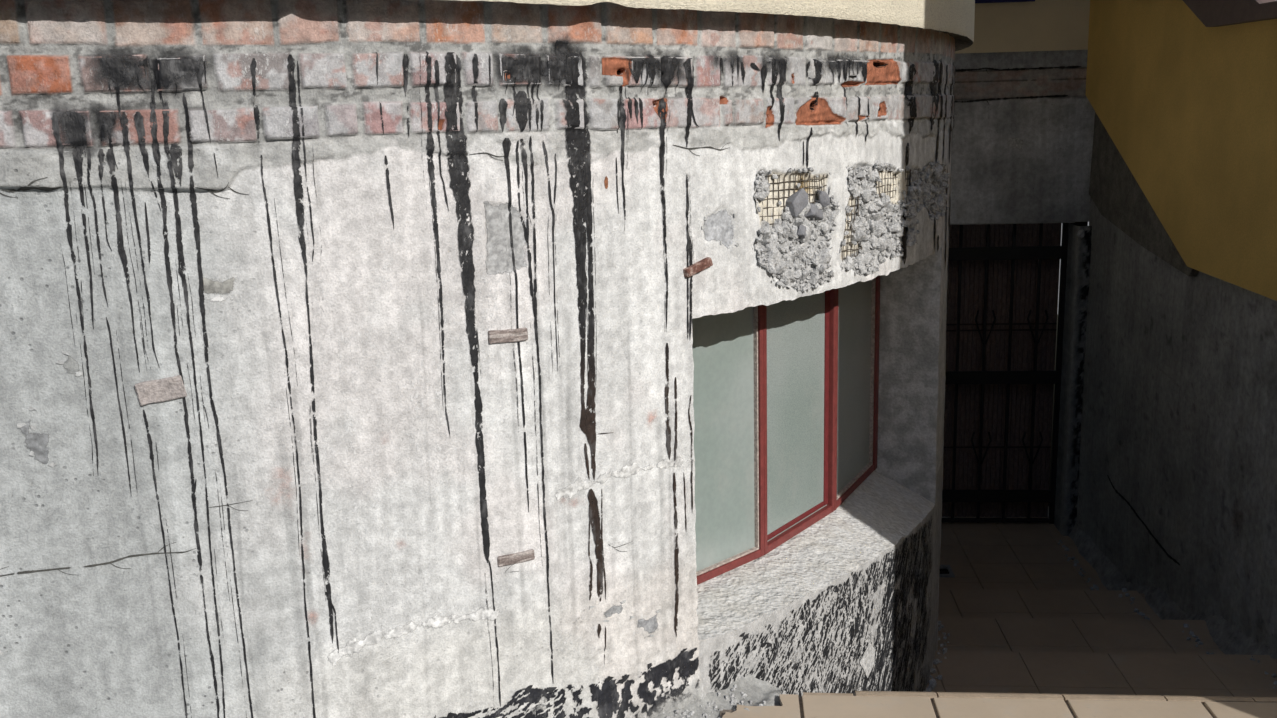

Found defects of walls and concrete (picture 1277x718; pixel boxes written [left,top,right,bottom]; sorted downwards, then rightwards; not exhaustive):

spalling [602,57,632,86]
water stain [711,52,787,141]
spalling [795,96,887,126]
spalling [841,59,901,87]
crack [0,177,62,198]
crack [196,182,249,199]
spalling [753,161,950,293]
water stain [51,50,254,718]
water stain [261,54,339,718]
water stain [403,37,614,707]
water stain [616,53,699,636]
crack [0,542,196,577]